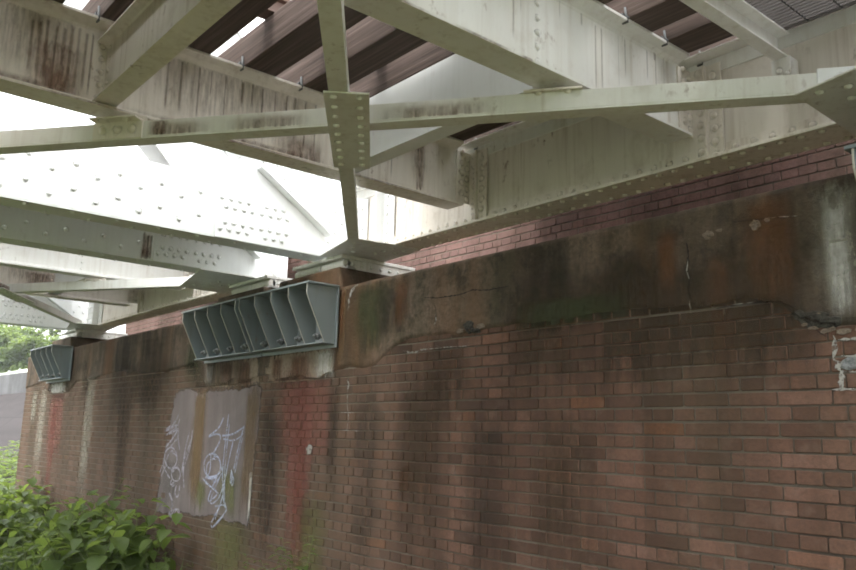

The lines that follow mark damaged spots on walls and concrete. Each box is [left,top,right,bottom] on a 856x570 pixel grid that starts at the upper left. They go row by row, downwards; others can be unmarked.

damp [826,193,856,301]
spalling [791,310,856,335]